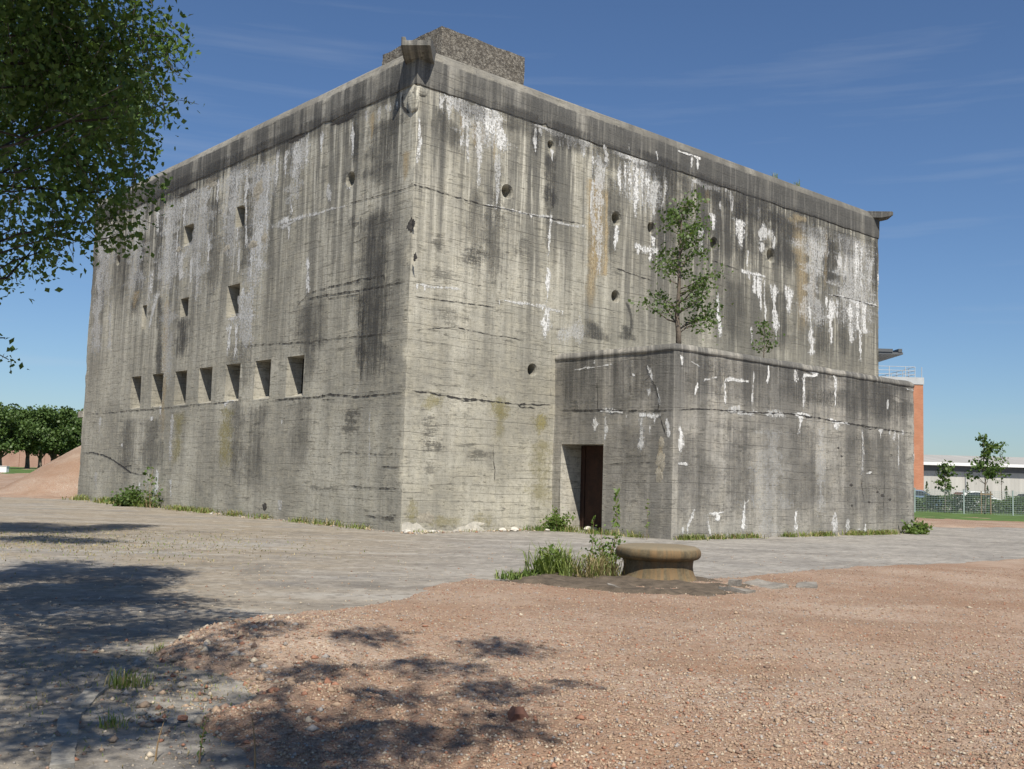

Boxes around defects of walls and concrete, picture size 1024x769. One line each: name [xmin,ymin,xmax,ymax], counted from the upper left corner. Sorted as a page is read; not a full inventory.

damp [439,94,800,338]
damp [358,212,390,372]
efflorescence [807,302,815,355]
damp [820,234,879,359]
crack [89,452,141,475]
crack [277,366,913,506]
damp [593,365,687,465]